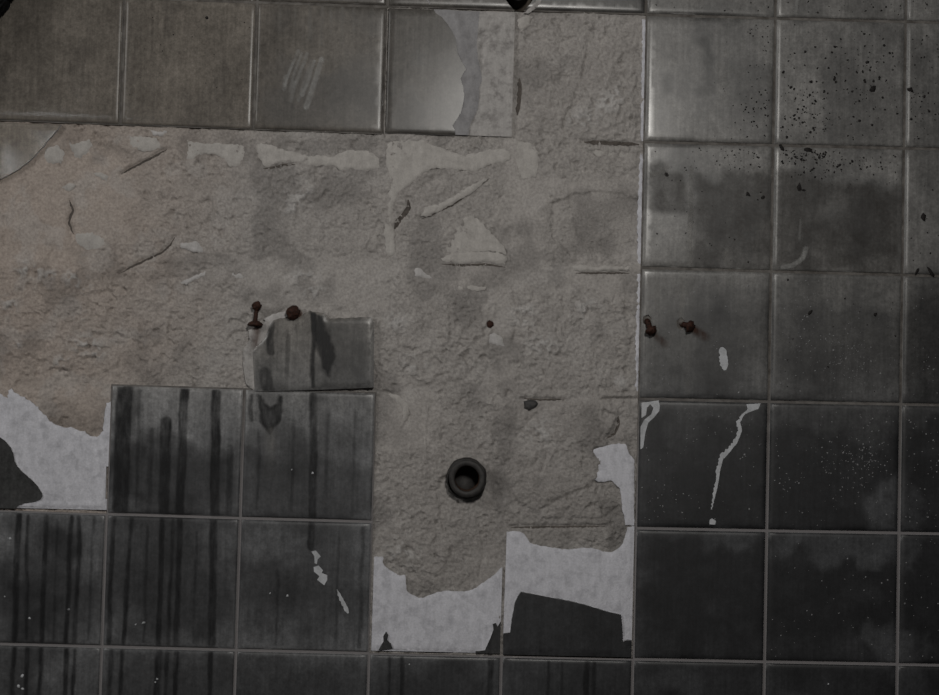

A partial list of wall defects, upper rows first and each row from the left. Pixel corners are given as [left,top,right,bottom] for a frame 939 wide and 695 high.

leakage [113,387,132,512]
leakage [159,389,189,561]
leakage [210,390,220,603]
leakage [259,383,282,433]
leakage [310,312,335,491]
spalling [0,0,660,658]
leakage [12,563,45,695]
leakage [64,516,81,695]